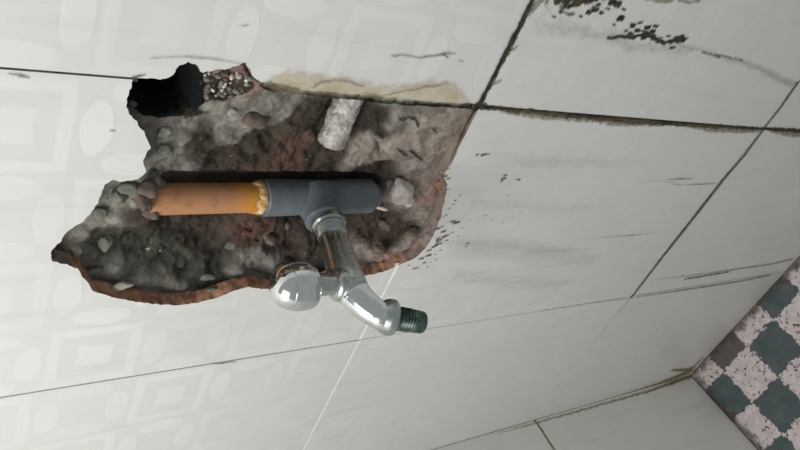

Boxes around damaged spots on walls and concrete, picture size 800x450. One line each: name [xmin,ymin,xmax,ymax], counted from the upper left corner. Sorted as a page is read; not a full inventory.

damp [270,76,463,102]
damp [473,0,800,137]
spalling [51,62,478,305]
damp [526,358,703,450]